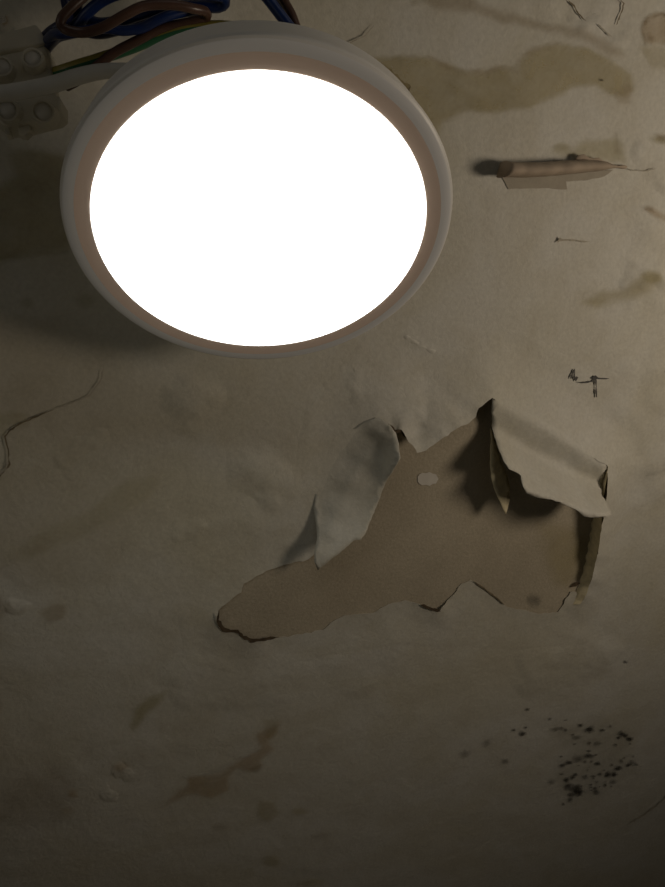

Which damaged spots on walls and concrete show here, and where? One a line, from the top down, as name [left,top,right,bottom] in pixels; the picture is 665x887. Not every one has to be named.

peeling [496,154,627,190]
crack [0,366,104,476]
peeling [177,320,665,676]